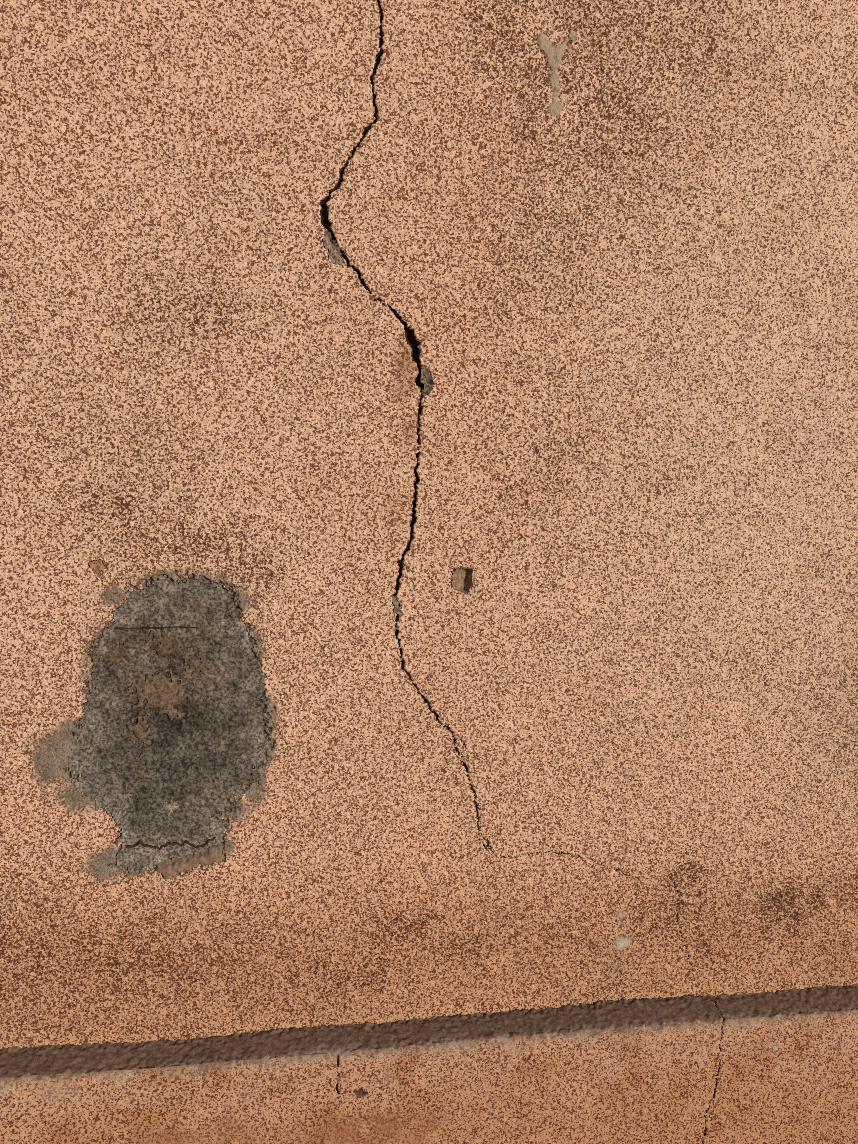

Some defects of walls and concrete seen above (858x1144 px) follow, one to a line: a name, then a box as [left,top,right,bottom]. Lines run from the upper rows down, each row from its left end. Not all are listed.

spalling [32,570,277,882]
crack [320,0,636,878]